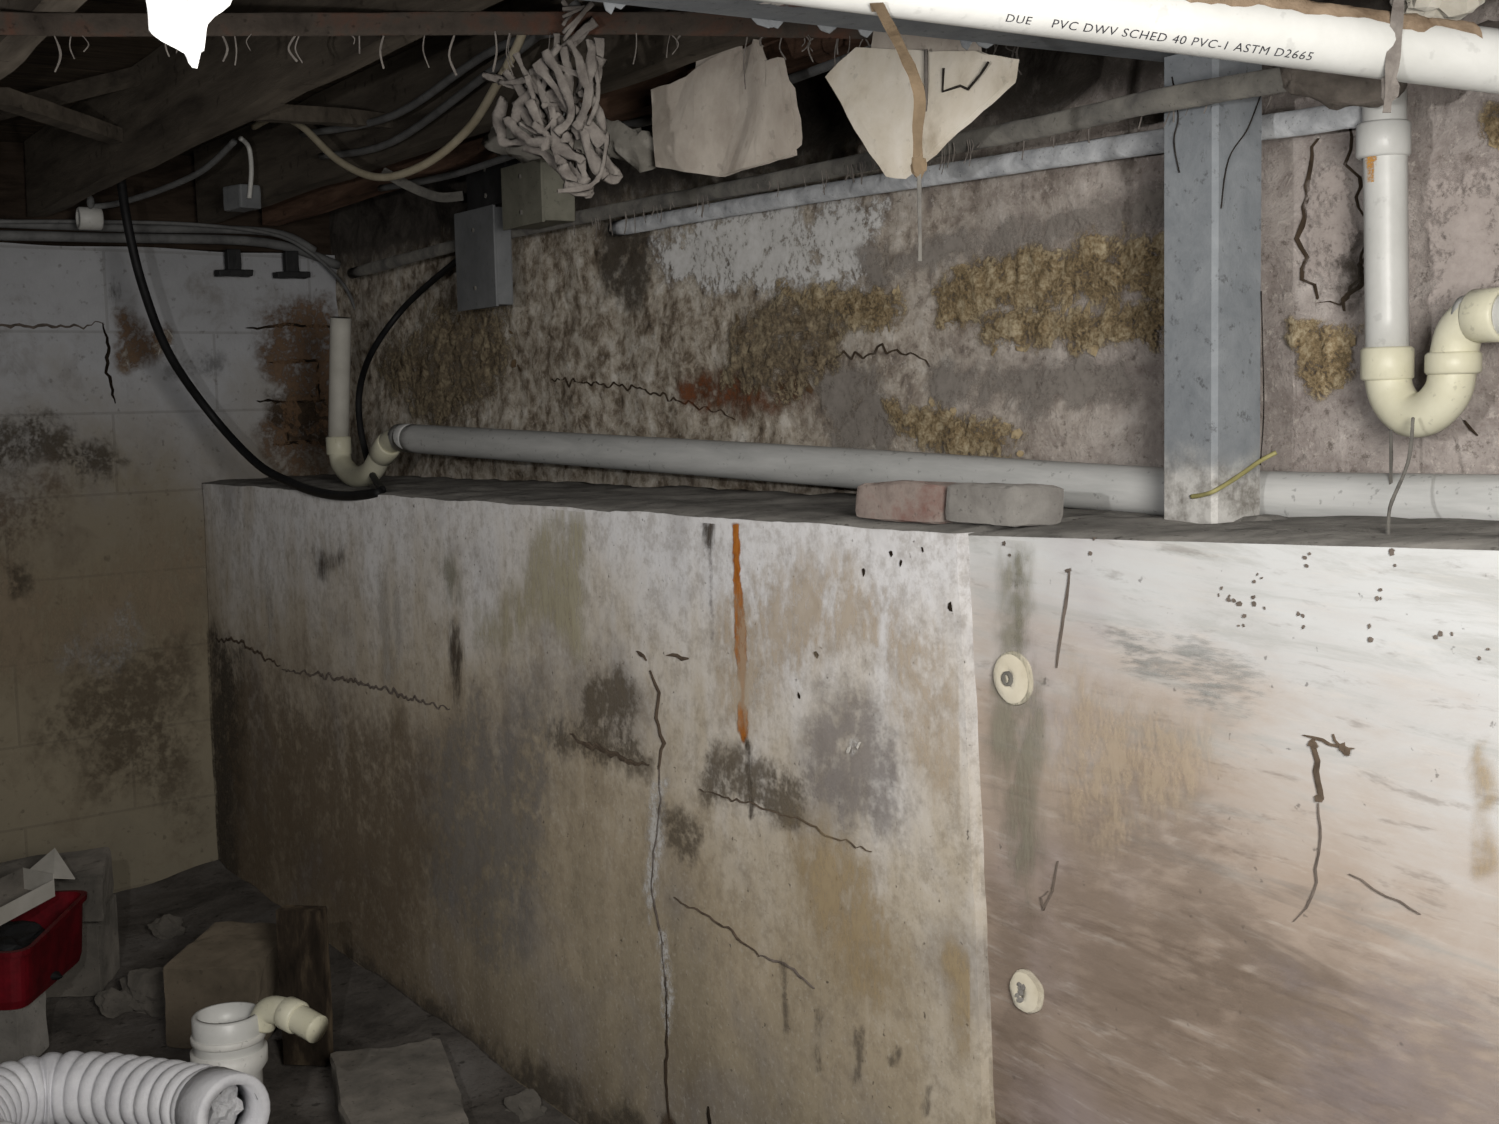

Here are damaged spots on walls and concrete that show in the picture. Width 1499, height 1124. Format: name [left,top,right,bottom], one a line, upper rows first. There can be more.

leakage [600,231,651,310]
crack [1221,96,1261,209]
crack [1294,129,1364,311]
leakage [0,419,119,474]
crack [1258,291,1266,465]
crack [1463,420,1478,436]
crack [215,636,450,710]
rust [733,523,753,819]
leakage [549,668,702,906]
crack [569,651,815,1124]
leakage [701,704,896,828]
crack [1293,734,1421,922]